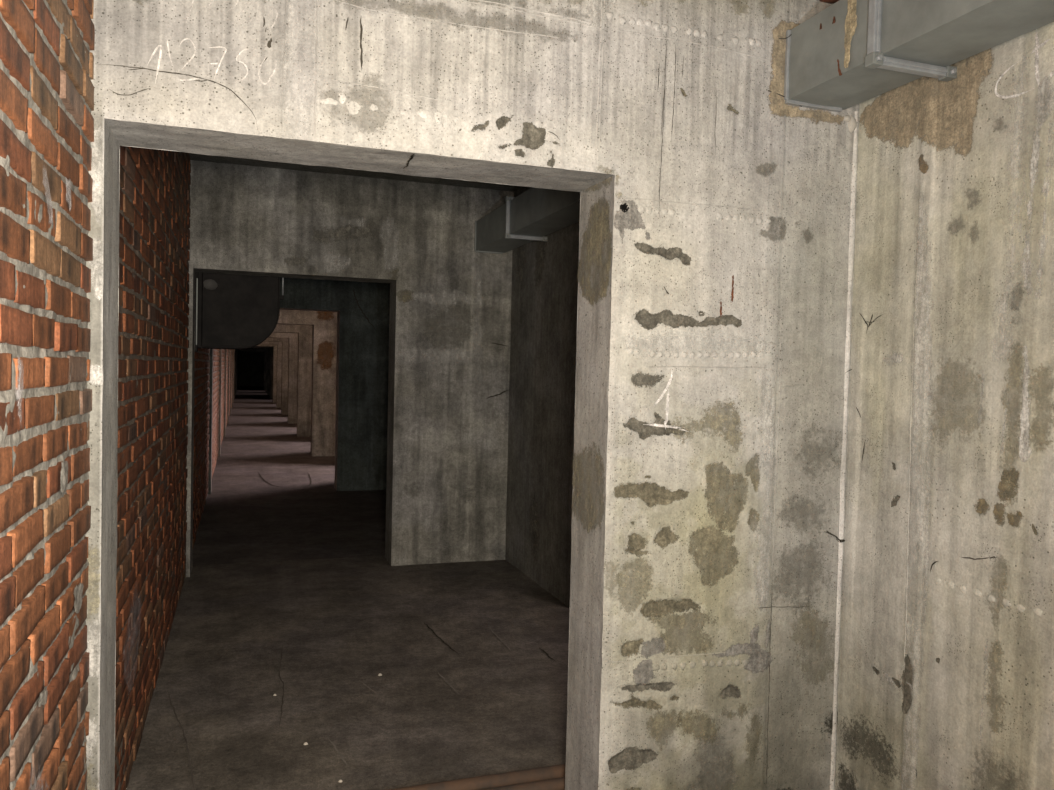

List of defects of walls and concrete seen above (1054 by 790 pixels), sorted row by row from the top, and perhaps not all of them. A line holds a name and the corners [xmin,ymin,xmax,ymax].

spalling [459,116,559,167]
spalling [635,243,691,266]
spalling [635,309,742,330]
damp [672,402,743,448]
damp [1003,346,1051,462]